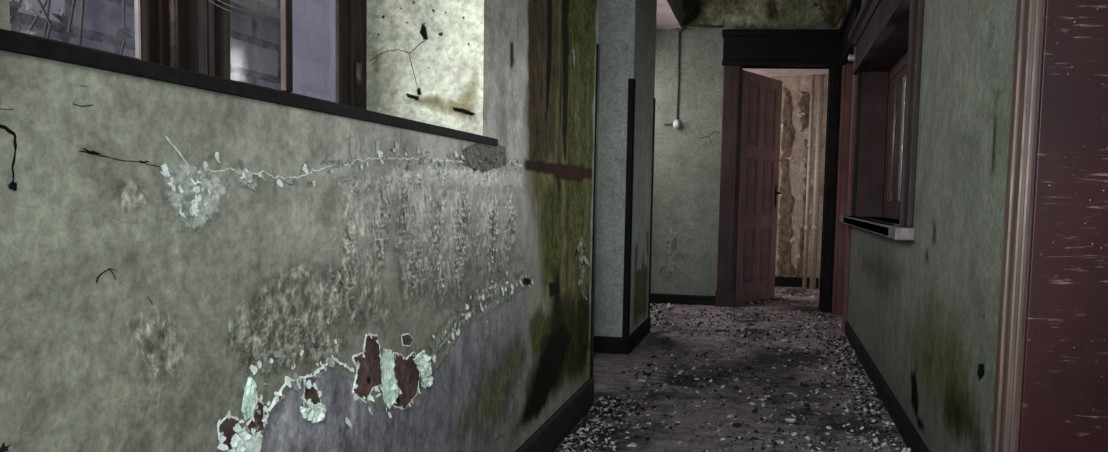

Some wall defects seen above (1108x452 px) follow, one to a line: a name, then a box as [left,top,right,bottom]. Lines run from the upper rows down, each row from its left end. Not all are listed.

crack [370,40,426,87]
crack [0,108,17,191]
crack [80,148,160,167]
peeling [191,143,524,190]
damp [524,0,590,423]
peeling [776,87,815,278]
peeling [217,268,537,452]
damp [911,354,924,431]